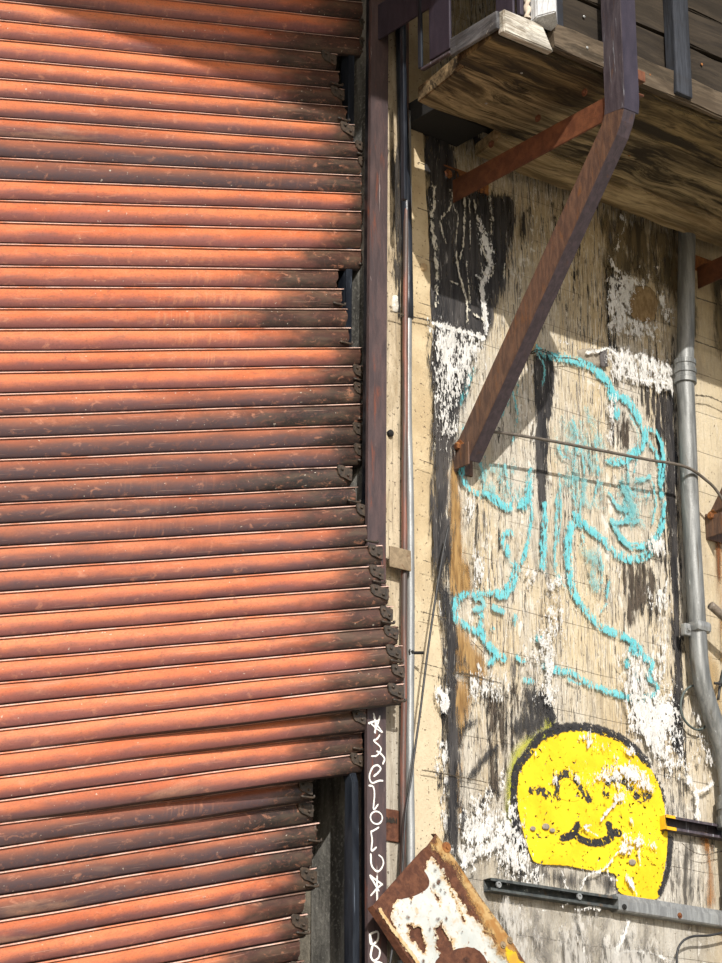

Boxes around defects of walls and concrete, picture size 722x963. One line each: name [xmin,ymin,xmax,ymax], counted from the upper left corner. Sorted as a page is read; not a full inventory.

peeling [629,286,658,322]
corrosion [367,834,525,963]